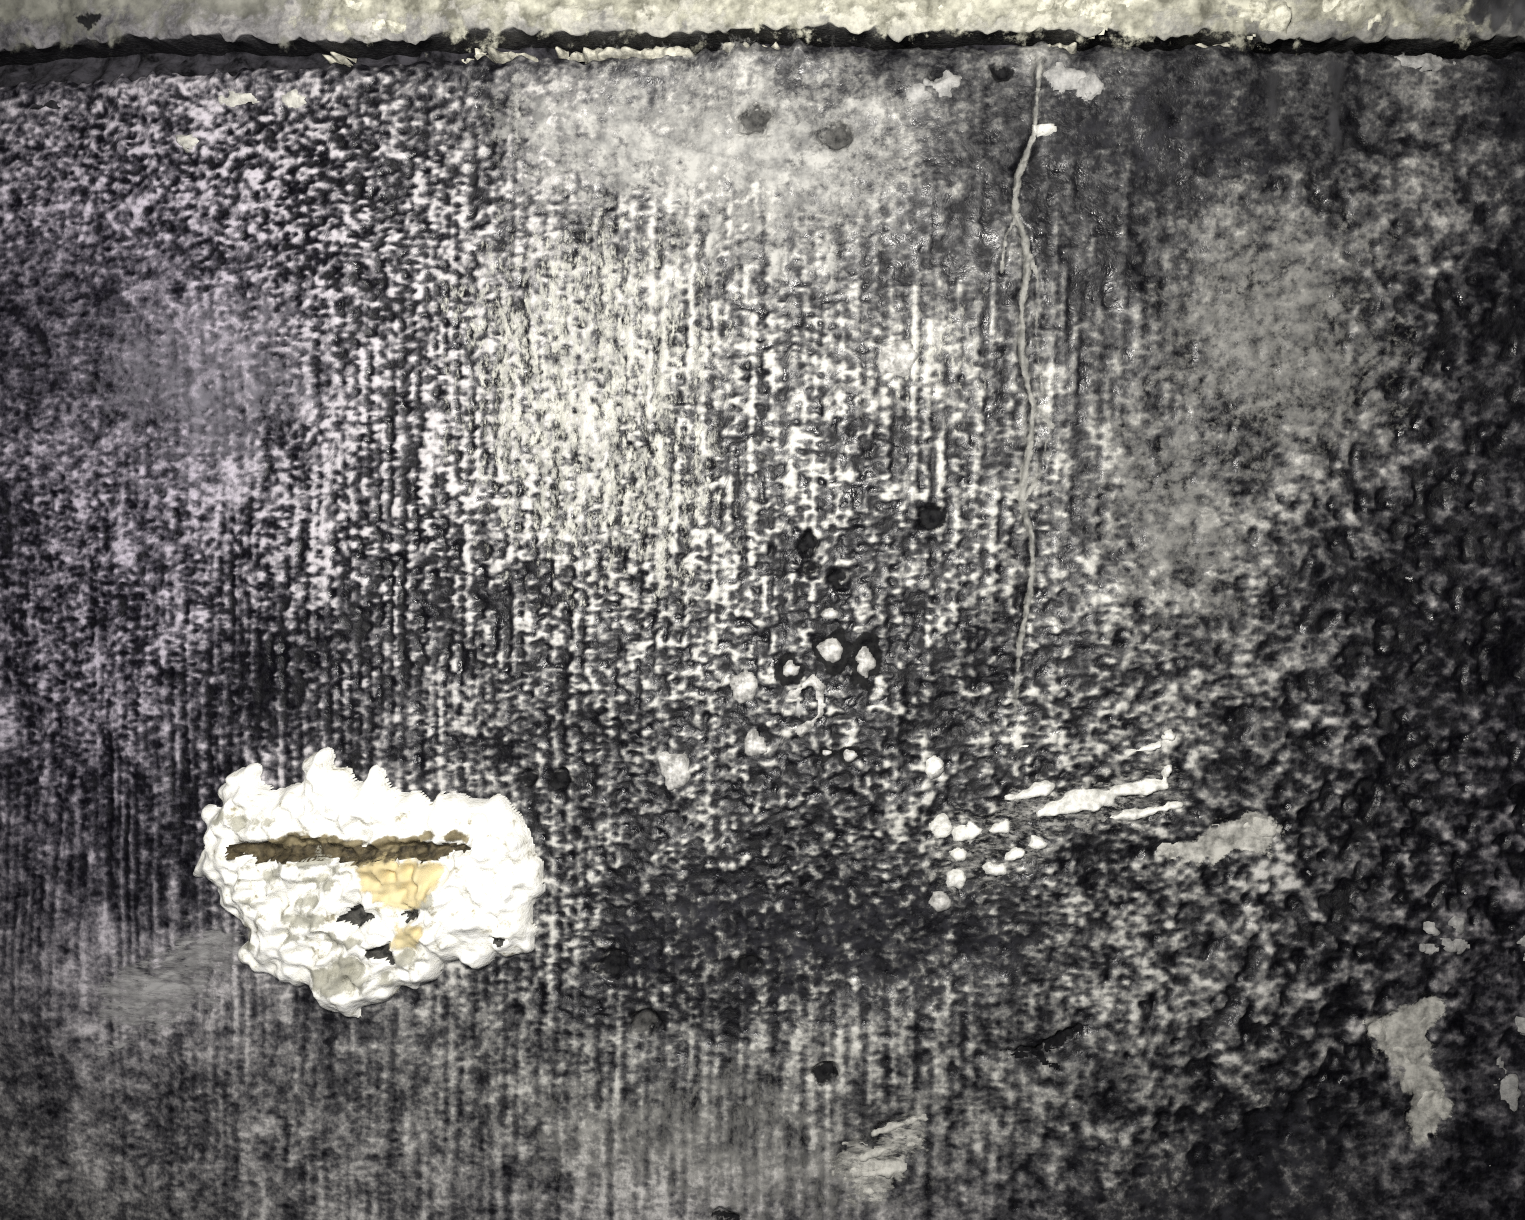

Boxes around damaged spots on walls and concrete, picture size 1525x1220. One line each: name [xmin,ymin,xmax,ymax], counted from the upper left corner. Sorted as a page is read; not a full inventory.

crack [1000,60,1057,718]